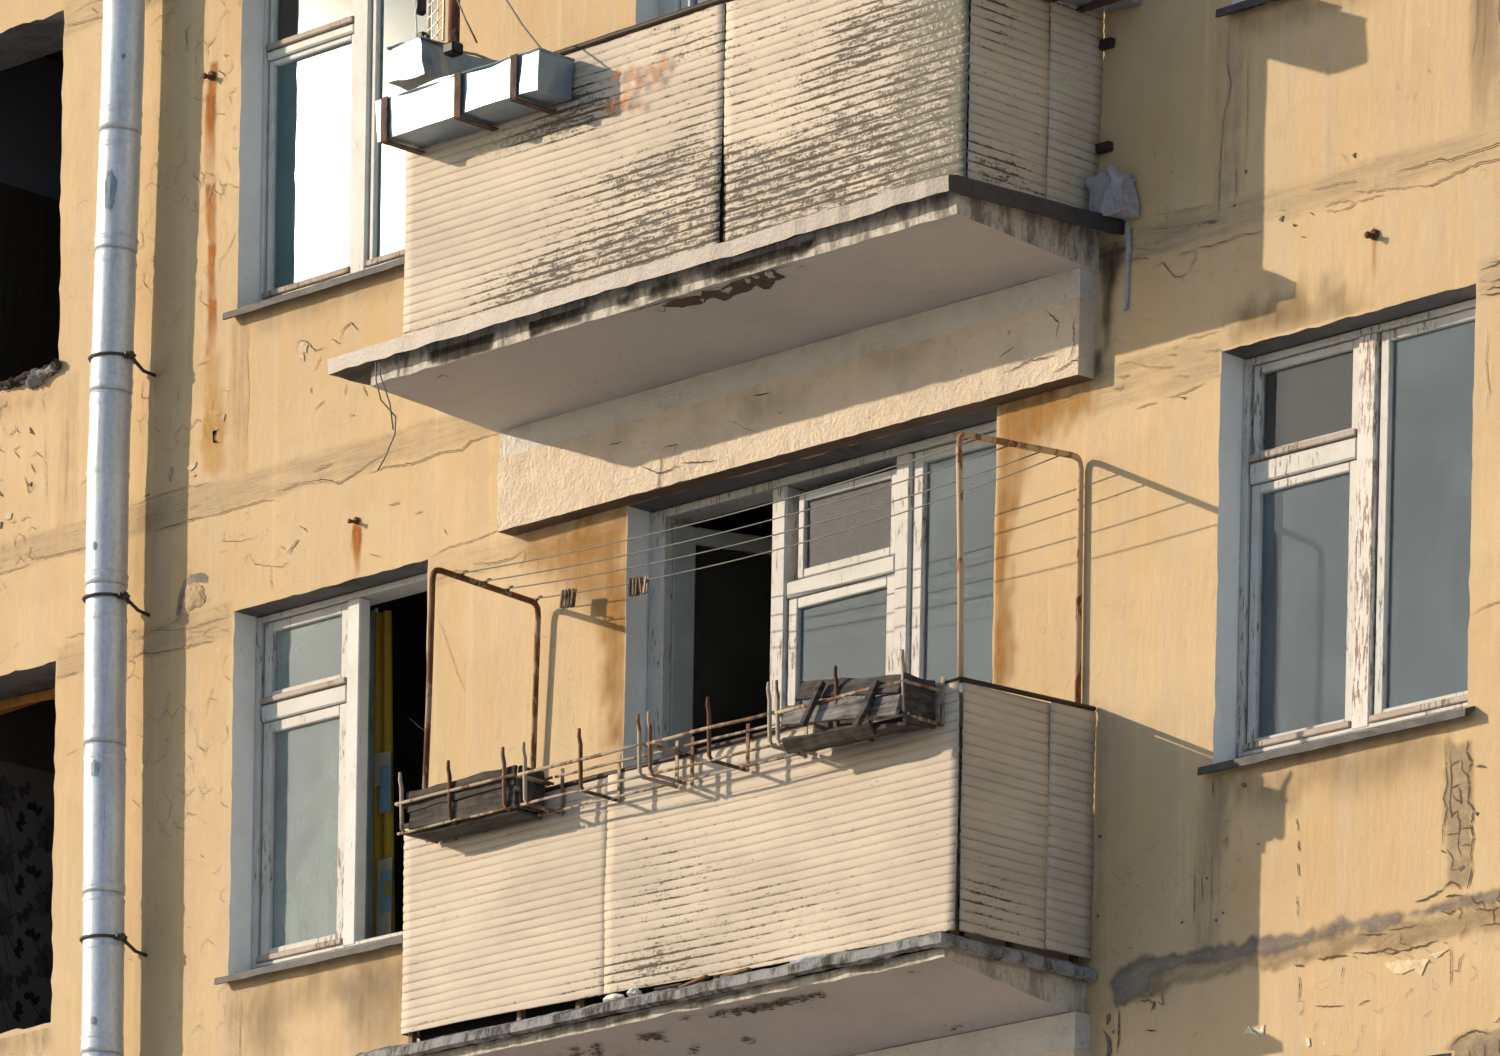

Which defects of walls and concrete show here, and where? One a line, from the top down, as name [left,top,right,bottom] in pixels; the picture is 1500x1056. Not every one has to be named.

corrosion [206,64,216,131]
crack [1132,40,1500,279]
corrosion [206,186,216,328]
water stain [712,240,813,278]
water stain [648,280,678,298]
peeling [663,270,785,308]
water stain [529,306,585,337]
crack [1481,260,1500,411]
corrosion [352,525,361,558]
water stain [537,530,618,657]
peeling [1384,949,1449,975]